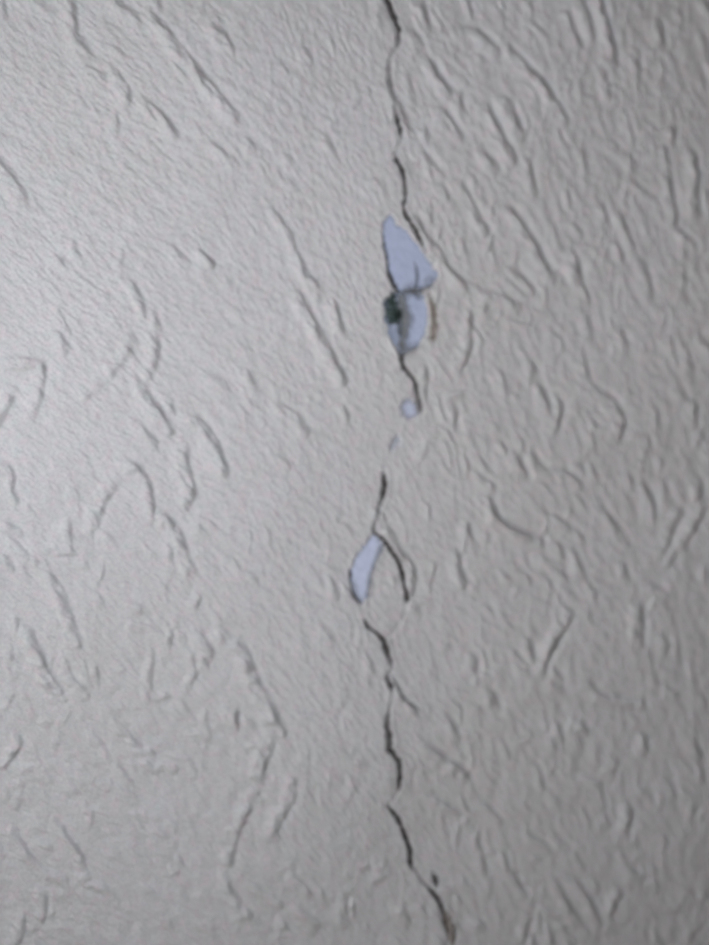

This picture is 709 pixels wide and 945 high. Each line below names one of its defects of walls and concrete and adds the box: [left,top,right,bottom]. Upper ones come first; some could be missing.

crack [385,0,401,41]
crack [384,111,423,293]
spalling [383,215,438,358]
crack [400,353,421,411]
crack [379,474,387,503]
spalling [341,535,384,603]
crack [373,525,409,601]
crack [350,572,455,943]